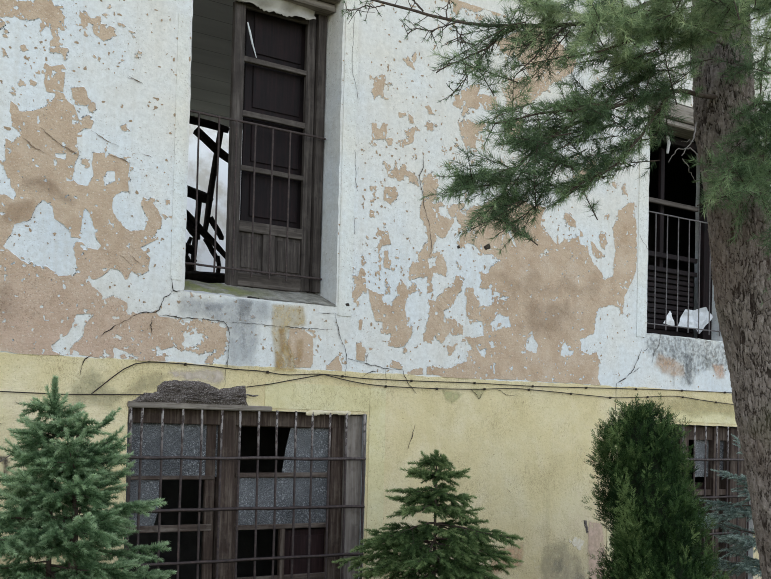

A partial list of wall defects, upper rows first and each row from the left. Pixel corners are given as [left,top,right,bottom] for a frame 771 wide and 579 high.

peeling [429,0,506,44]
peeling [0,0,256,365]
peeling [345,21,637,386]
crack [80,283,416,393]
peeling [251,306,373,371]
damp [650,337,727,376]